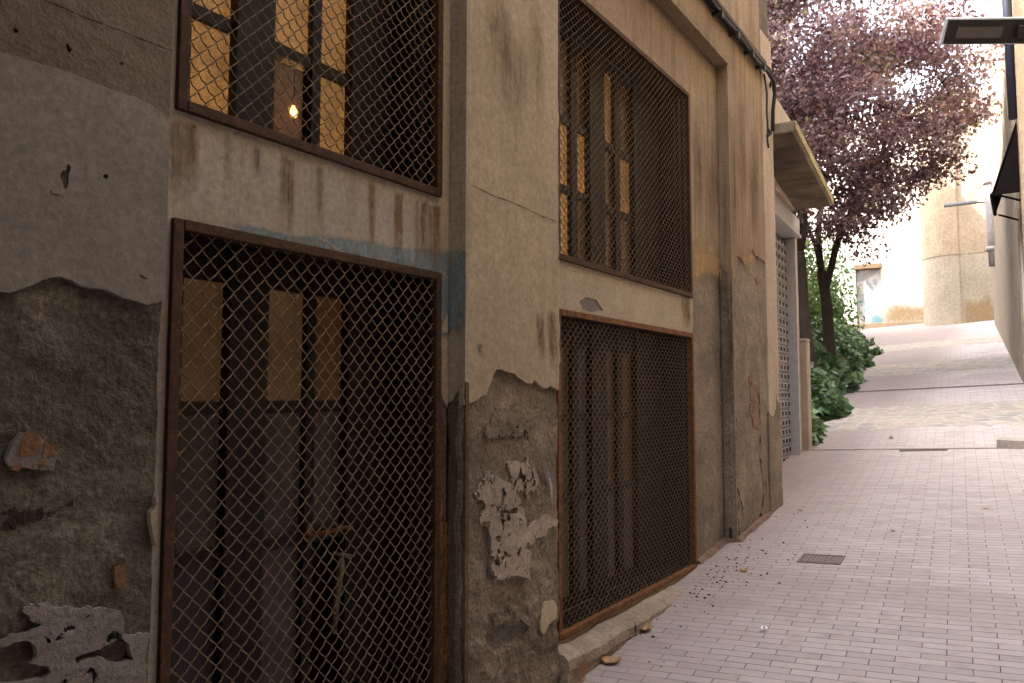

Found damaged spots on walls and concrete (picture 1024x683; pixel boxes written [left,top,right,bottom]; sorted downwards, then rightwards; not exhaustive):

crack [469,183,558,223]
spalling [0,277,162,683]
spalling [444,370,560,683]
spalling [692,251,783,562]